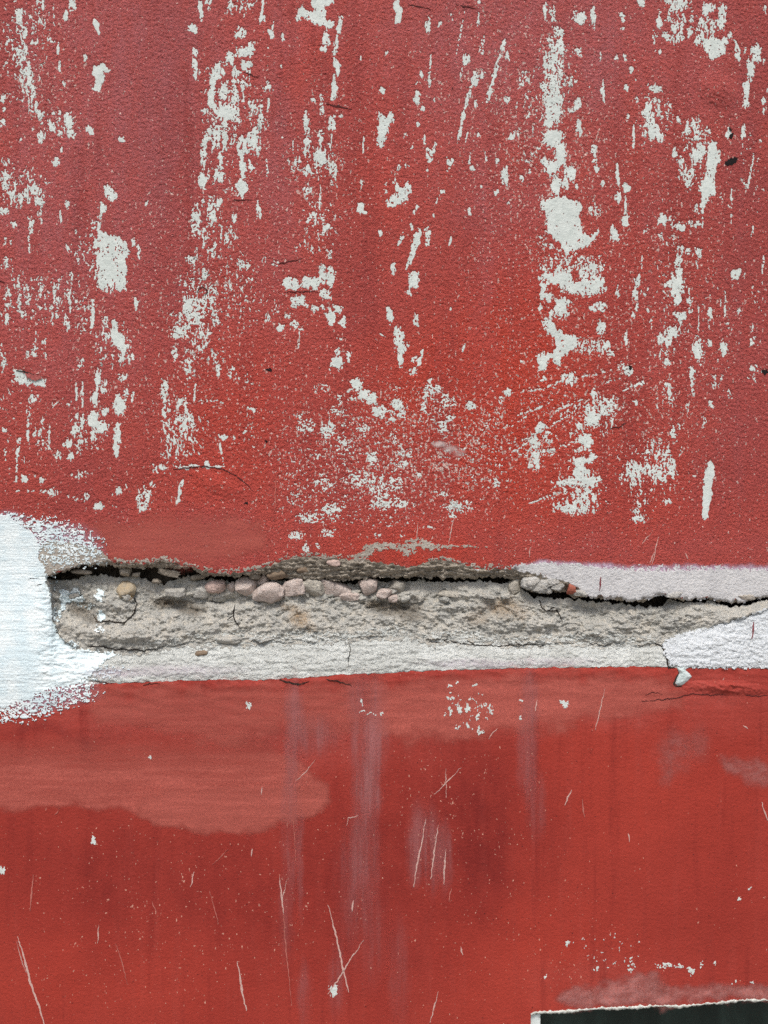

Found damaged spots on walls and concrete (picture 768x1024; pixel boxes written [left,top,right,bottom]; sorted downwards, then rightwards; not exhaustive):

spalling [0,0,768,723]
crack [30,562,249,651]
crack [278,576,768,620]
peeling [444,681,494,735]
crack [643,692,768,702]